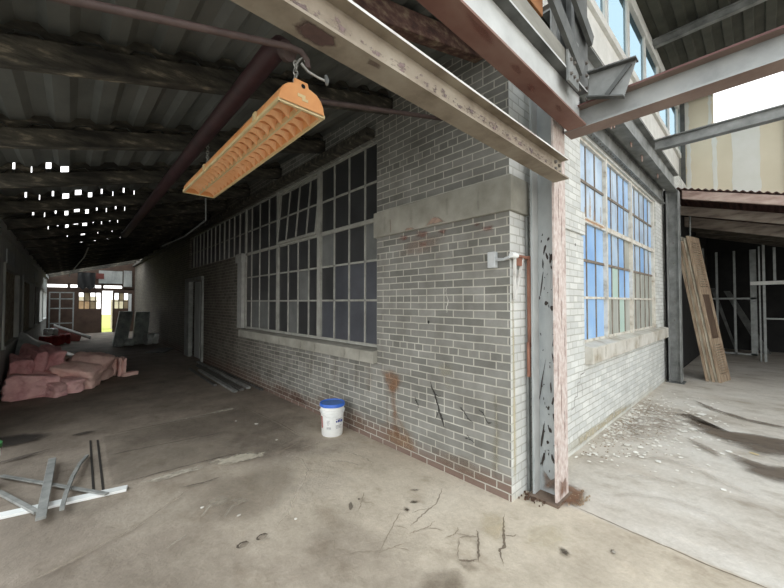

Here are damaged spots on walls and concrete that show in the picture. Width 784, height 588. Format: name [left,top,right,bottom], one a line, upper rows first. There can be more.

peeling [292,0,346,46]
peeling [539,234,553,311]
crack [415,382,445,428]
peeling [539,344,555,473]
corrosion [545,473,583,503]
crack [340,489,469,557]
crack [498,515,515,562]